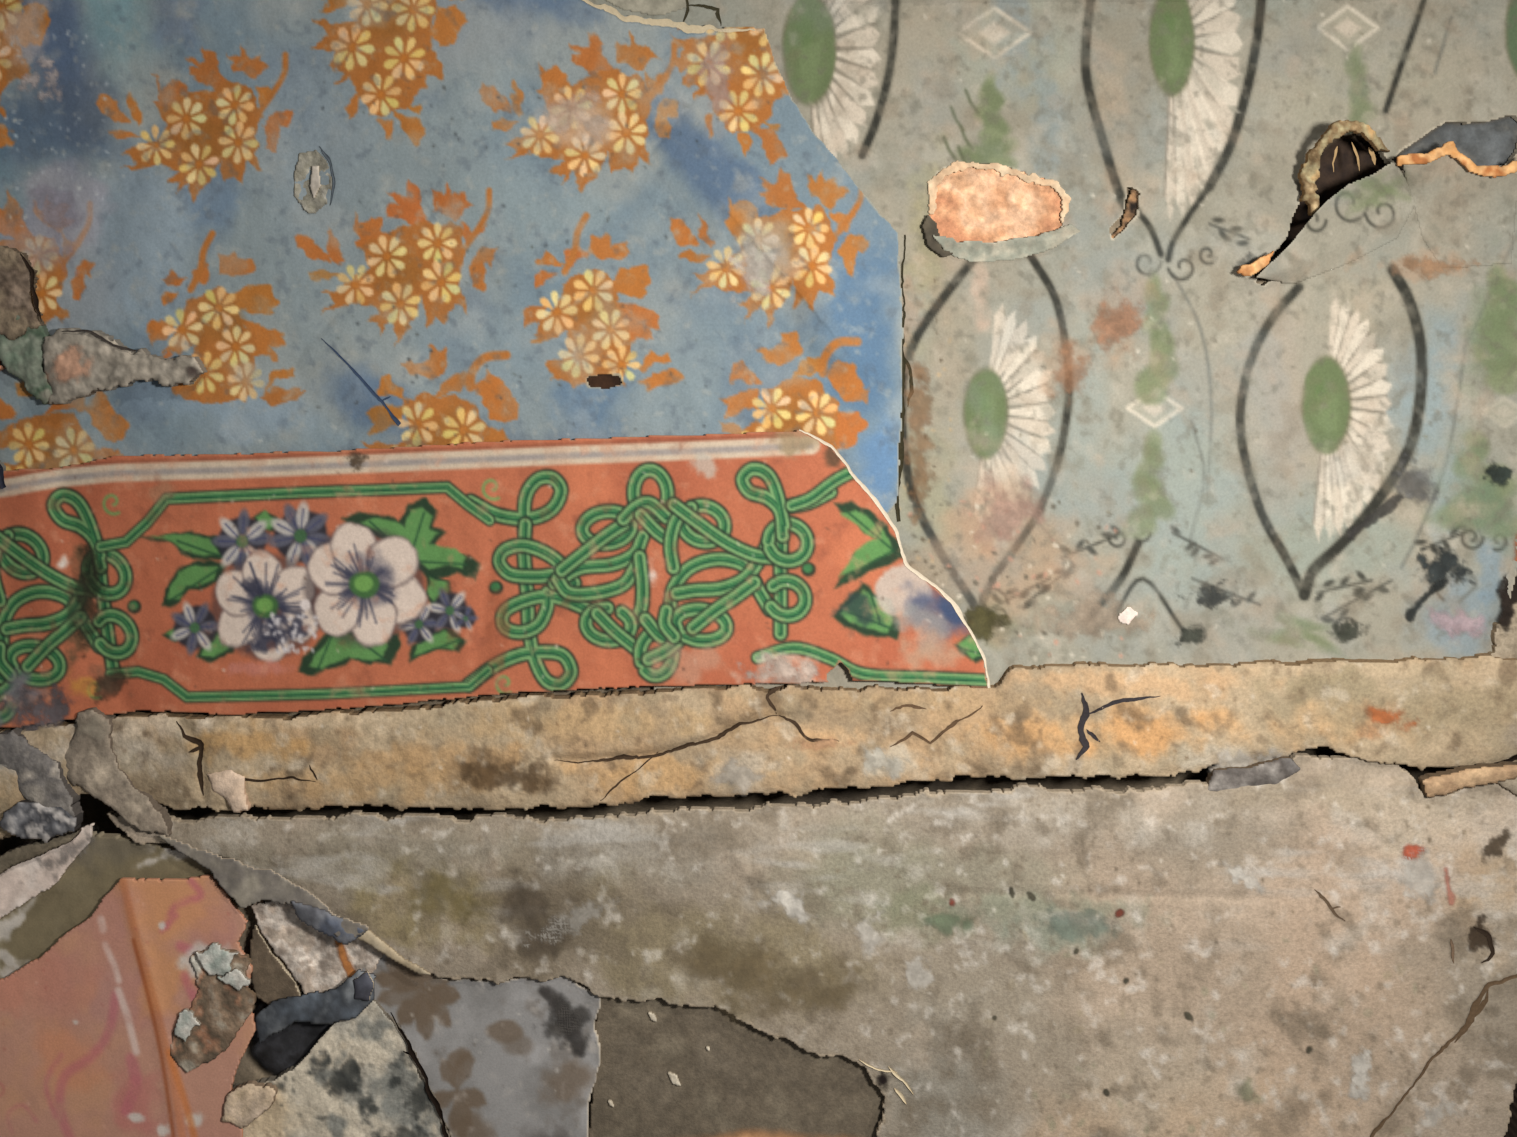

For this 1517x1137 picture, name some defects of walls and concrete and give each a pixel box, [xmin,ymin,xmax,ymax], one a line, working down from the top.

spalling [922,160,1080,262]
peeling [1236,120,1517,284]
peeling [42,328,208,404]
crack [176,721,204,796]
crack [245,765,317,782]
peeling [159,835,431,1129]
flaking render [589,997,884,1137]
crack [1370,974,1517,1137]